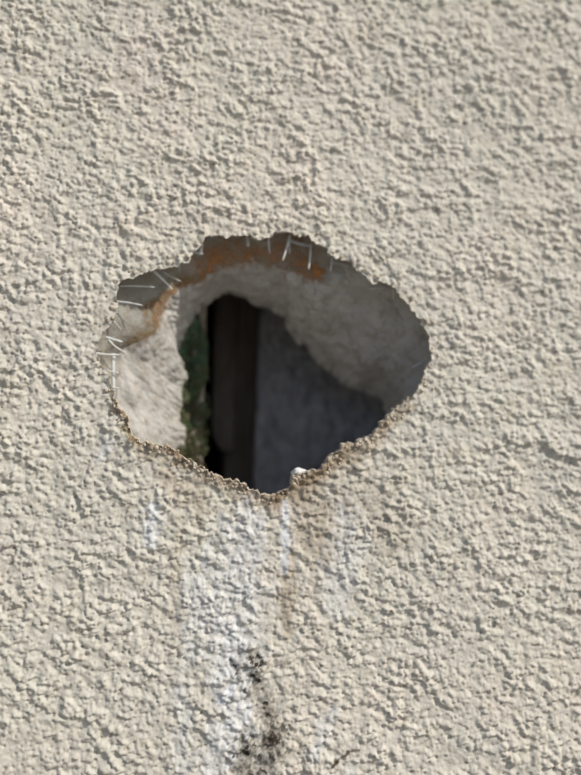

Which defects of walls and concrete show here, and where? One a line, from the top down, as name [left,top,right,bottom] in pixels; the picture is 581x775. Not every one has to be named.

rust [129,236,325,341]
spalling [92,220,440,504]
water stain [143,502,165,549]
water stain [279,501,291,575]
water stain [196,499,281,775]